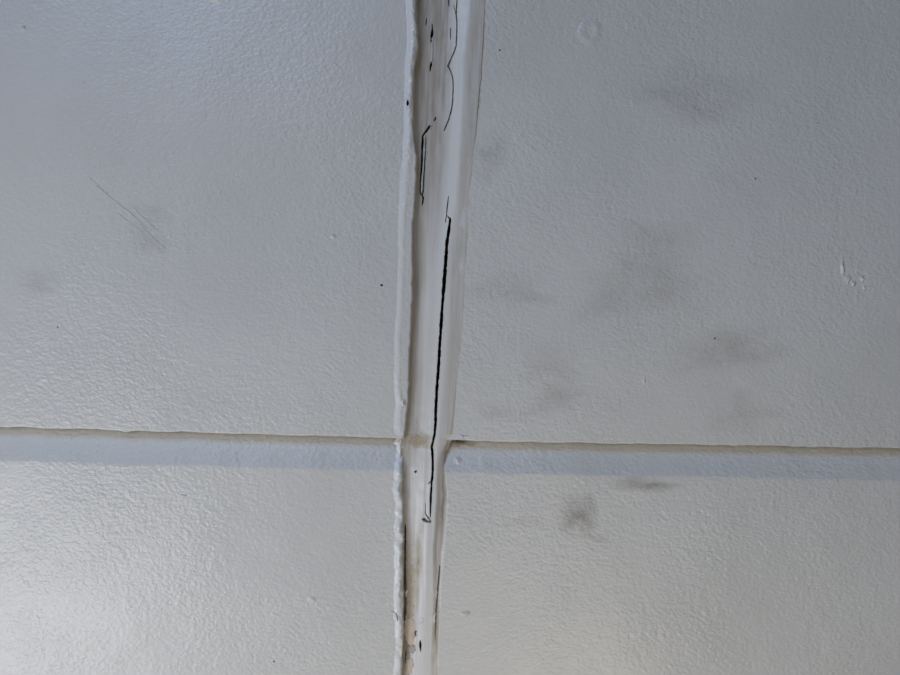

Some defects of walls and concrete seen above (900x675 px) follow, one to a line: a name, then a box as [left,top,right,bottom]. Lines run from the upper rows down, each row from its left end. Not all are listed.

crack [420,0,458,205]
crack [429,198,451,517]
peeling [404,612,436,674]